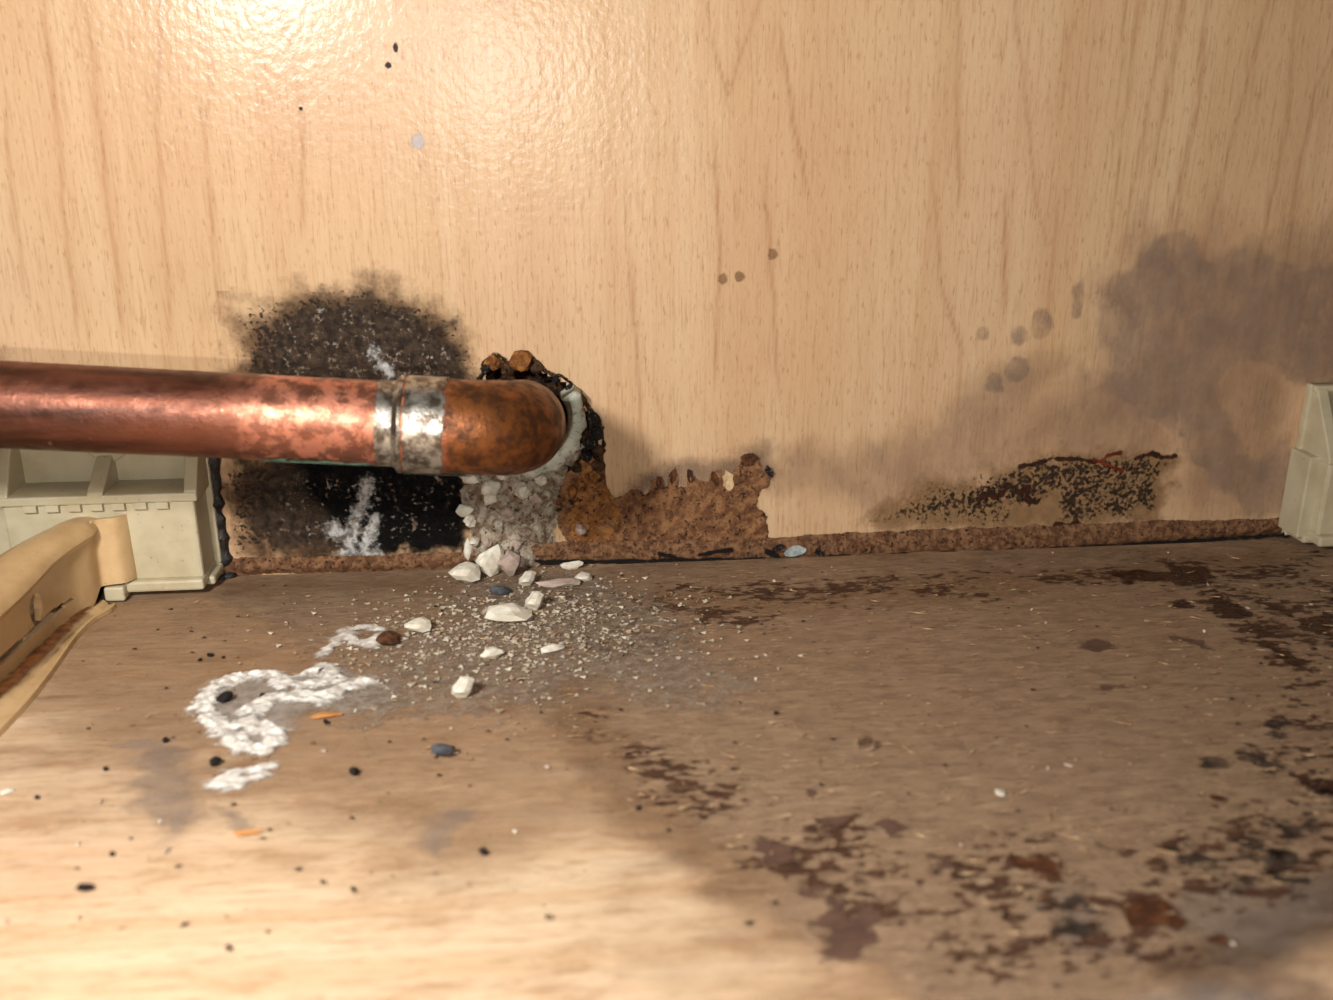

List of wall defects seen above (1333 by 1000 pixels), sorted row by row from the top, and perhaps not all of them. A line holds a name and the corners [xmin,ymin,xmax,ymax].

damp [234,291,477,380]
peeling [477,350,774,543]
damp [208,451,1333,1000]